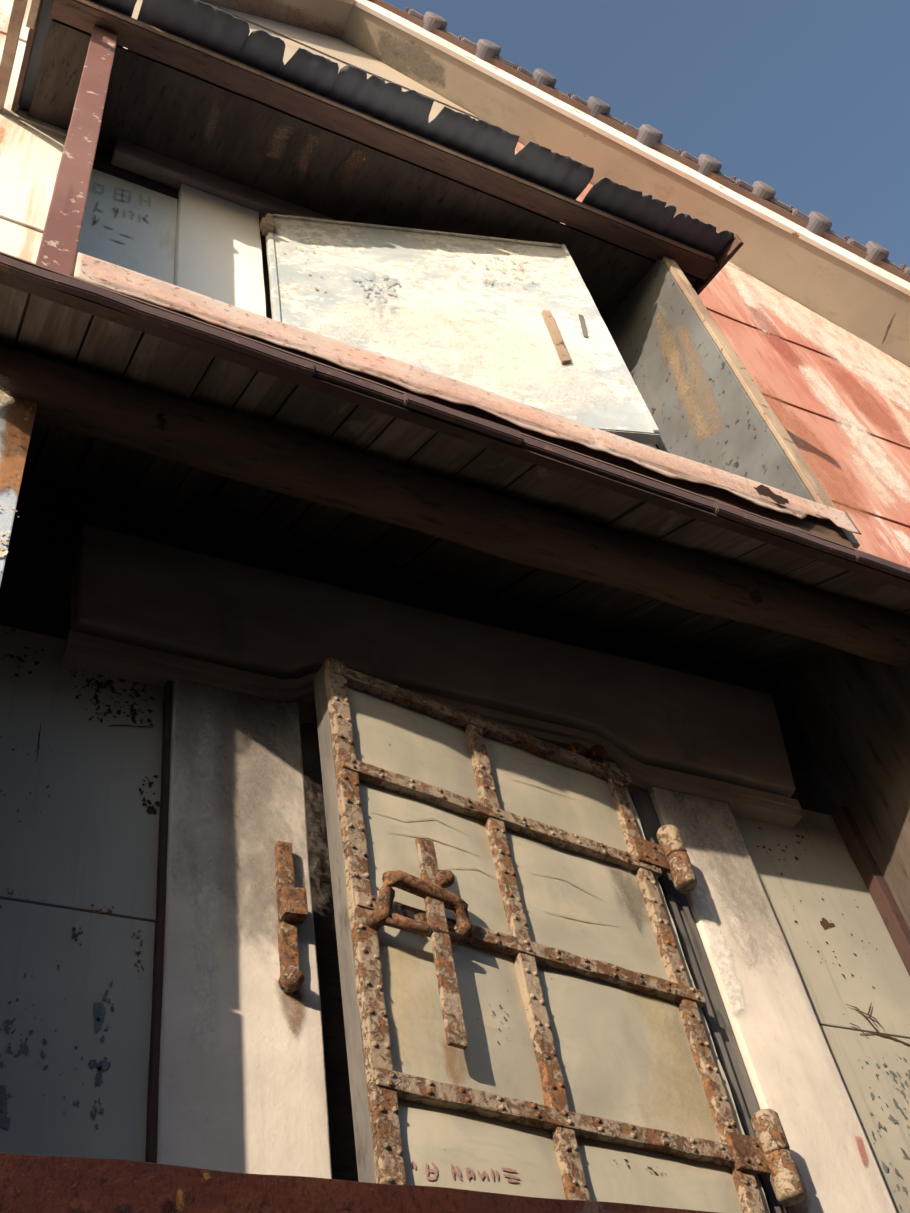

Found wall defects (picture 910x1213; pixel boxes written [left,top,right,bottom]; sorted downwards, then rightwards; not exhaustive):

rust [749,307,802,365]
rust [828,362,910,442]
rust [765,391,869,516]
peeling [69,669,155,728]
peeling [0,981,114,1129]
crack [846,1002,910,1046]
rust [855,1136,867,1165]
peeling [858,1057,910,1211]